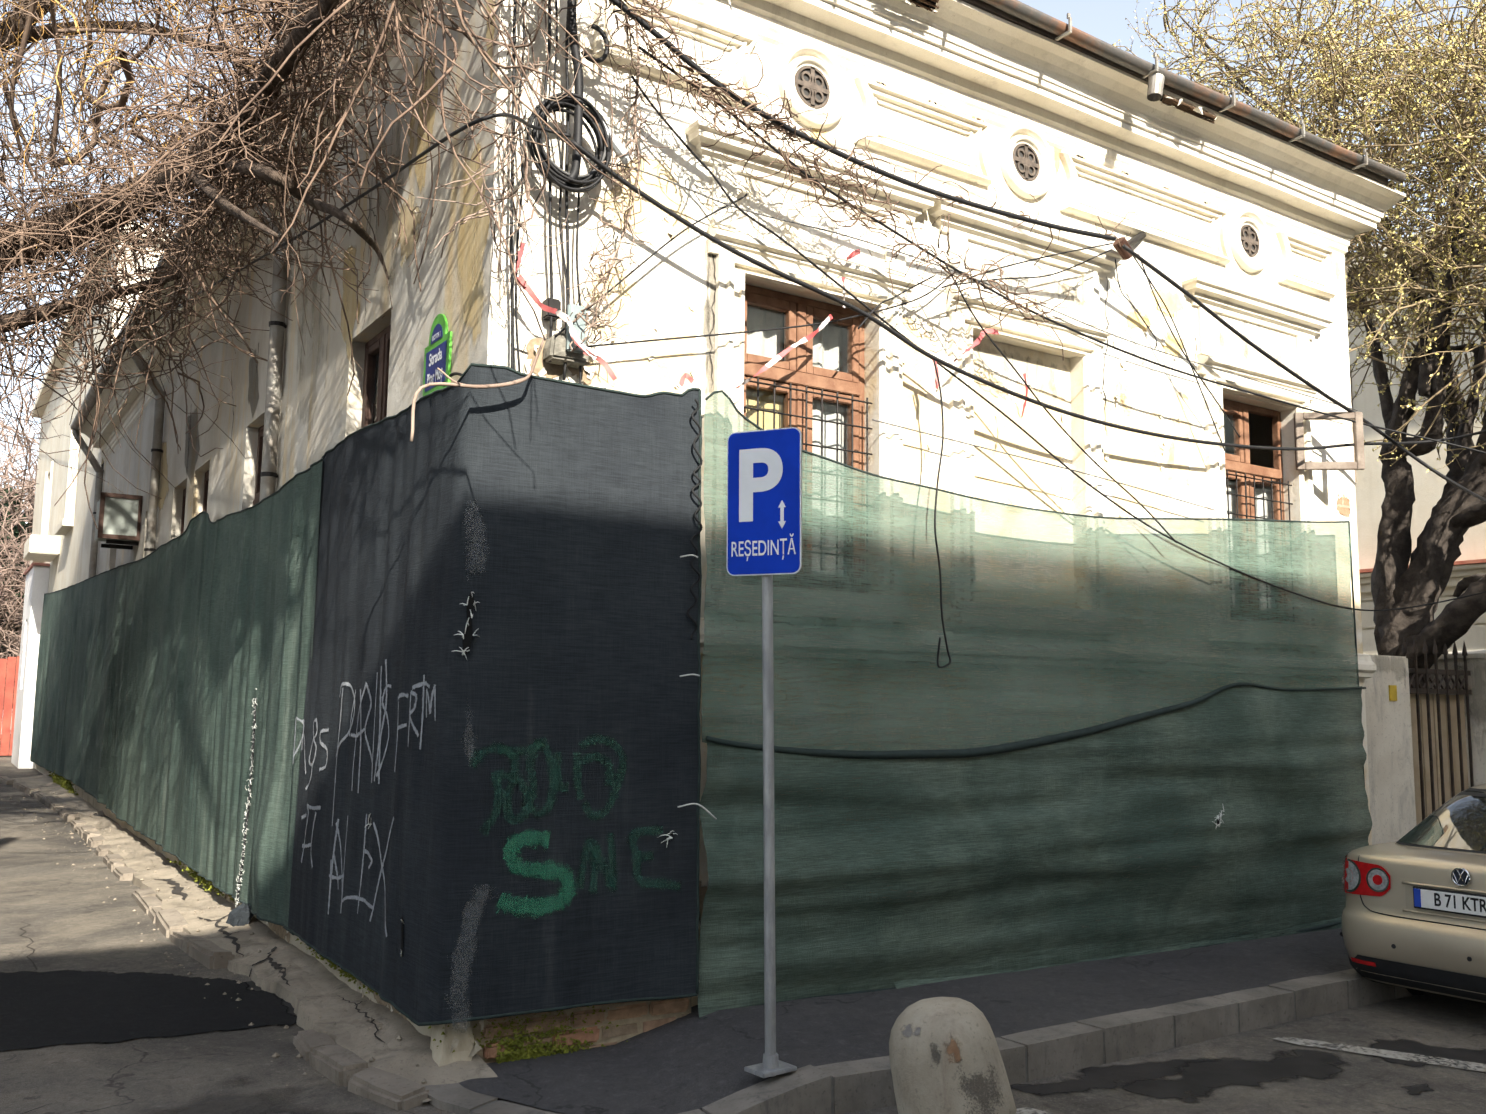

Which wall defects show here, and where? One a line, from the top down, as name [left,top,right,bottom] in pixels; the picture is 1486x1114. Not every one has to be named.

peeling [595,158,691,242]
peeling [525,260,698,389]
peeling [1127,289,1184,359]
peeling [889,316,932,483]
peeling [1103,359,1192,517]